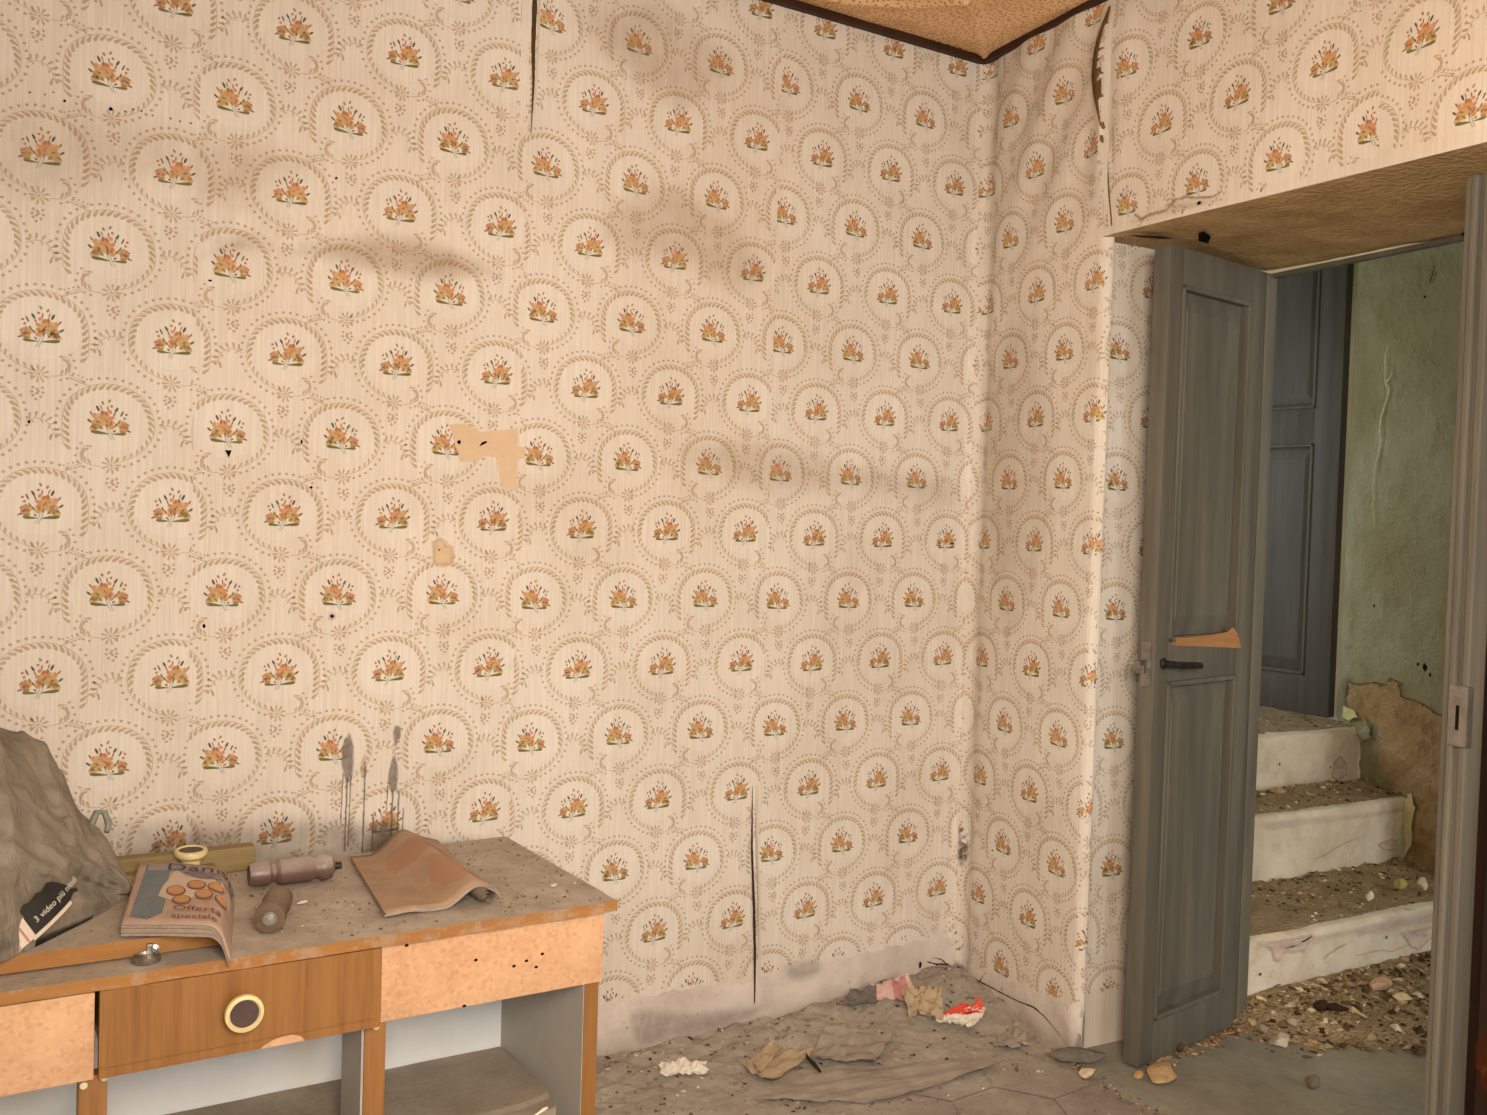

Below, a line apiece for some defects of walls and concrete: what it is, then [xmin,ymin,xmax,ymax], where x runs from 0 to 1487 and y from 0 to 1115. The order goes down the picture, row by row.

peeling [450,423,526,490]
peeling [434,540,453,565]
spalling [1342,678,1442,872]